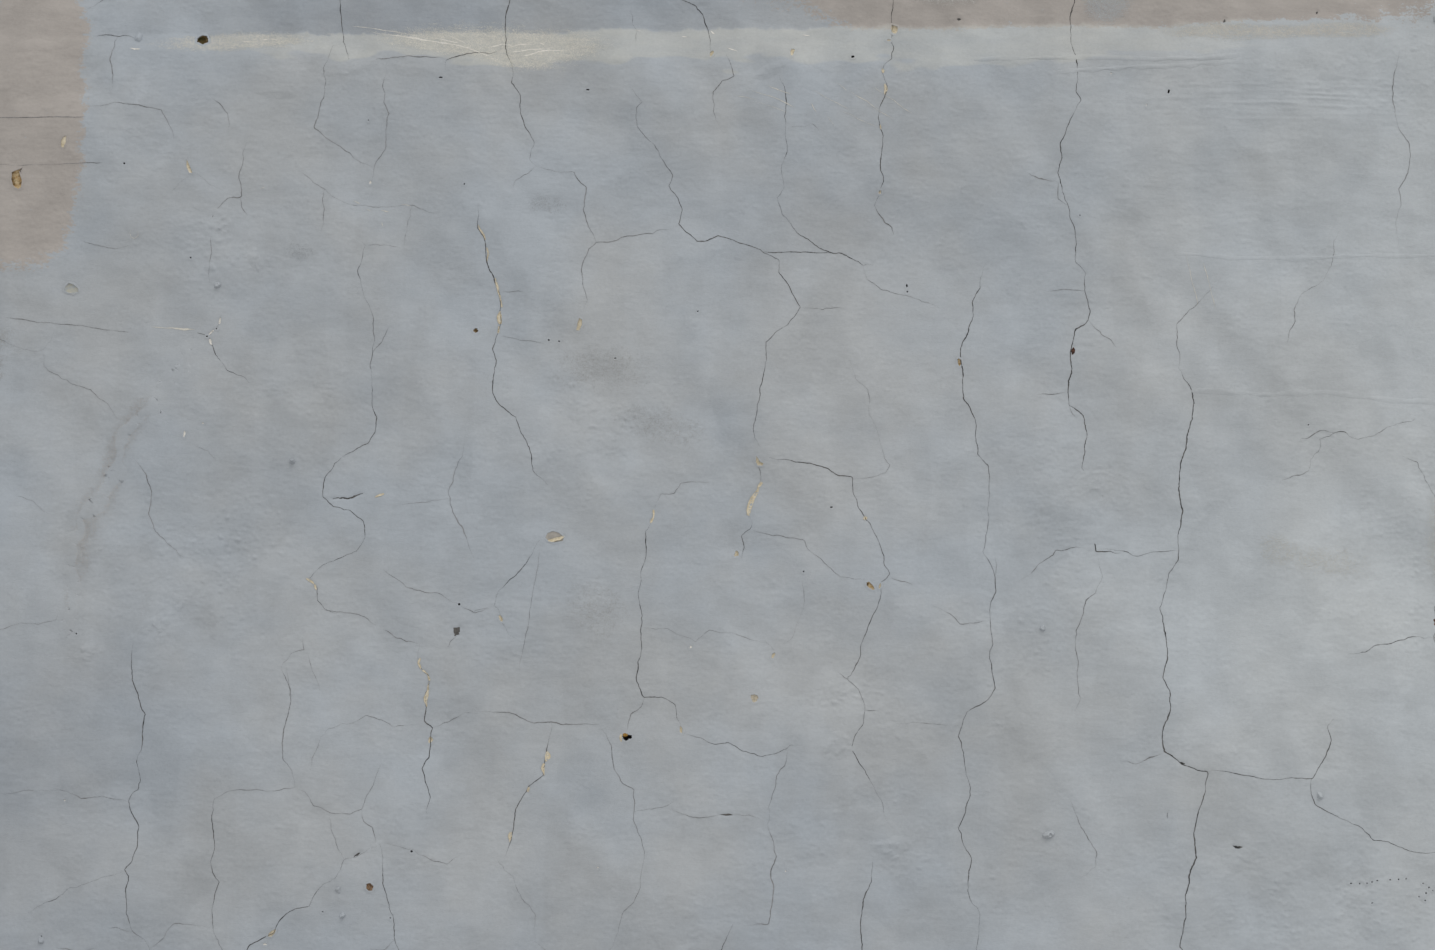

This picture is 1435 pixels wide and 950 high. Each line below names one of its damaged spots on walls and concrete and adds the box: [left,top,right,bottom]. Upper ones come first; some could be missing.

peeling [9,167,24,191]
crack [8,0,928,950]
crack [907,278,997,948]
crack [1029,0,1116,464]
crack [1032,294,1434,950]